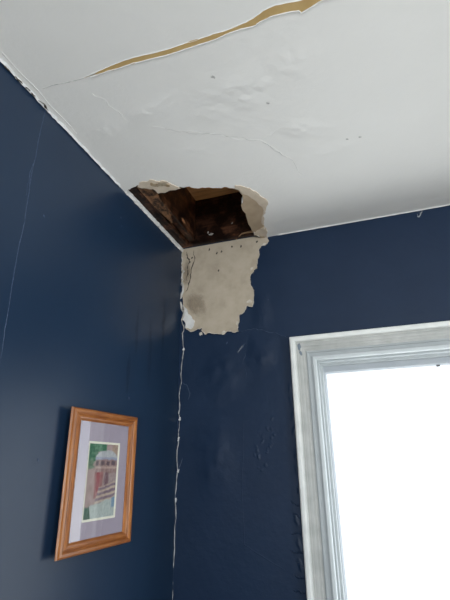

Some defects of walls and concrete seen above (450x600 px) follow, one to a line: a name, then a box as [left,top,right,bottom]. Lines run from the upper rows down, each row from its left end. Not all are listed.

crack [0,0,325,361]
peeling [180,236,269,336]
crack [173,334,190,567]